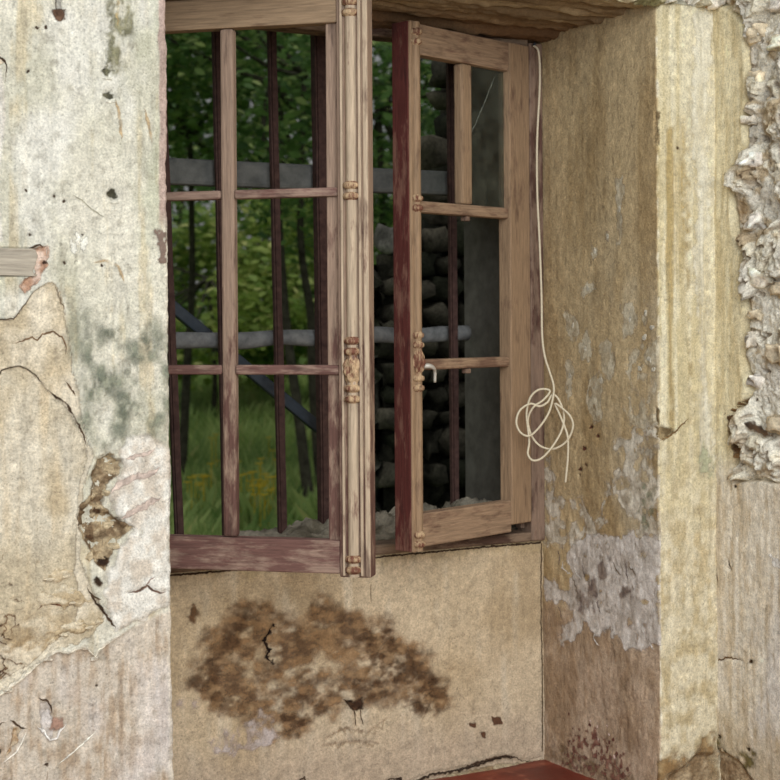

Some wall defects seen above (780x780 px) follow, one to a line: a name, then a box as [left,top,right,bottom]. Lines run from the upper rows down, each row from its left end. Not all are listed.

damp [106,3,133,75]
flaking render [725,399,758,458]
flaking render [744,421,776,437]
flaking render [0,244,133,696]
peeling [543,302,673,658]
crack [129,570,234,594]
crack [0,584,23,679]
crack [262,624,275,664]
damp [189,595,448,756]
crack [376,541,543,780]
flaking render [39,698,66,741]
flaking render [664,735,753,780]